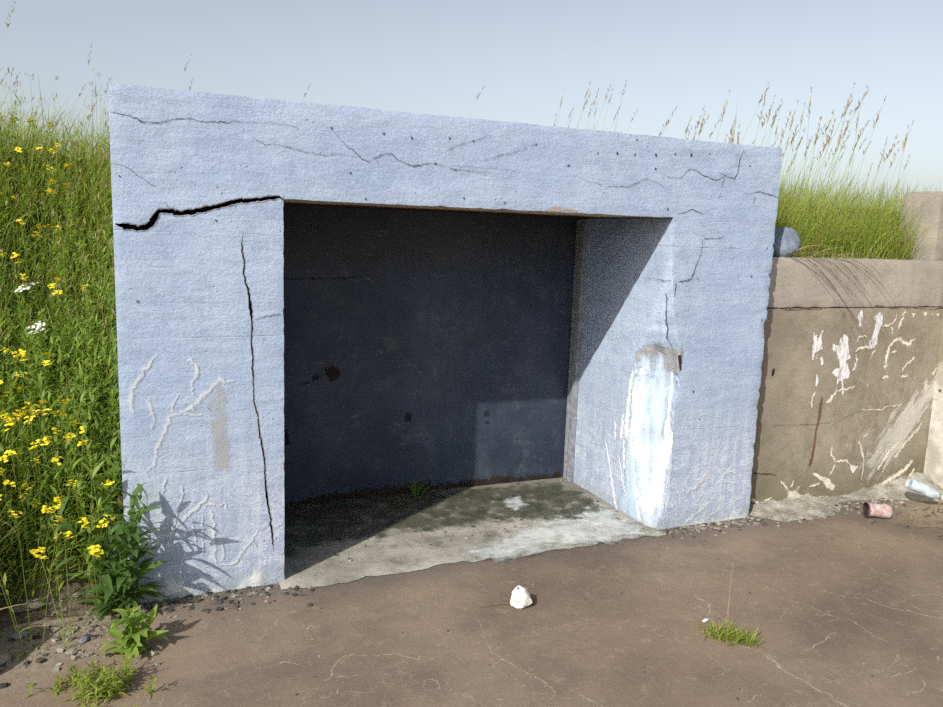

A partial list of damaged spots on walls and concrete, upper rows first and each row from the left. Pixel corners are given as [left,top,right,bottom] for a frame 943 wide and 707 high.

crack [114,112,536,173]
crack [115,164,283,232]
crack [241,232,278,552]
spalling [635,344,683,374]
rust [809,397,823,467]